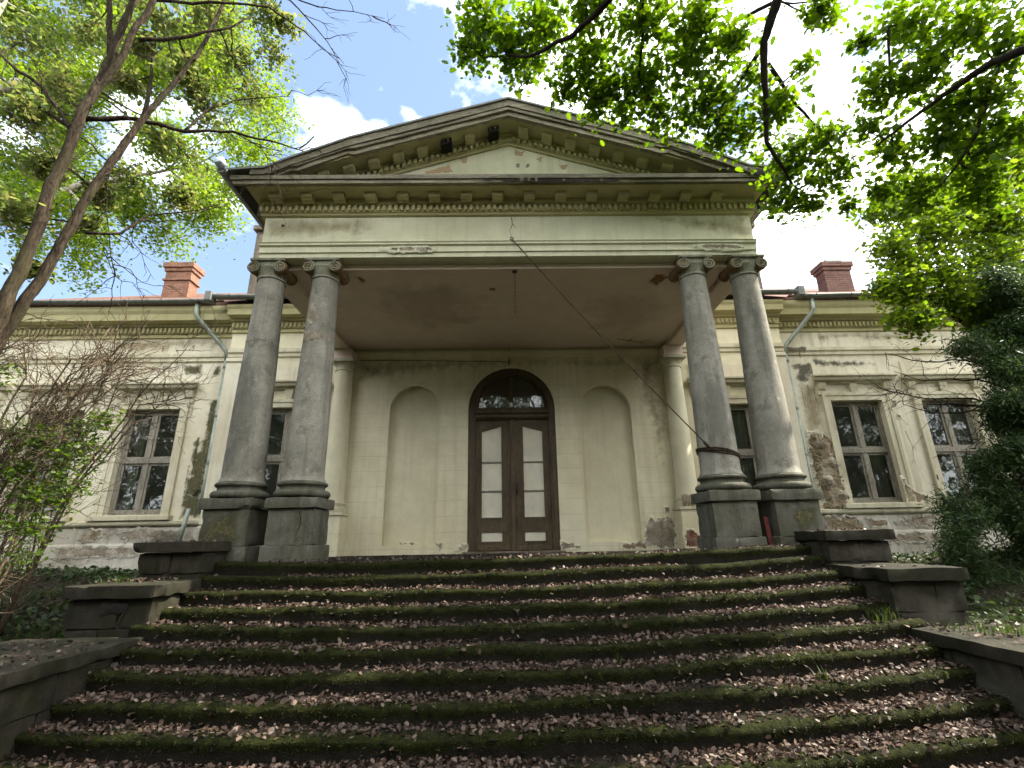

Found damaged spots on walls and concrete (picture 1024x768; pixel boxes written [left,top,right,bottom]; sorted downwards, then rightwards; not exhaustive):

leakage [787,346,863,425]
leakage [186,403,215,480]
peeling [54,526,180,561]
peeling [618,493,700,551]
spalling [805,430,947,545]